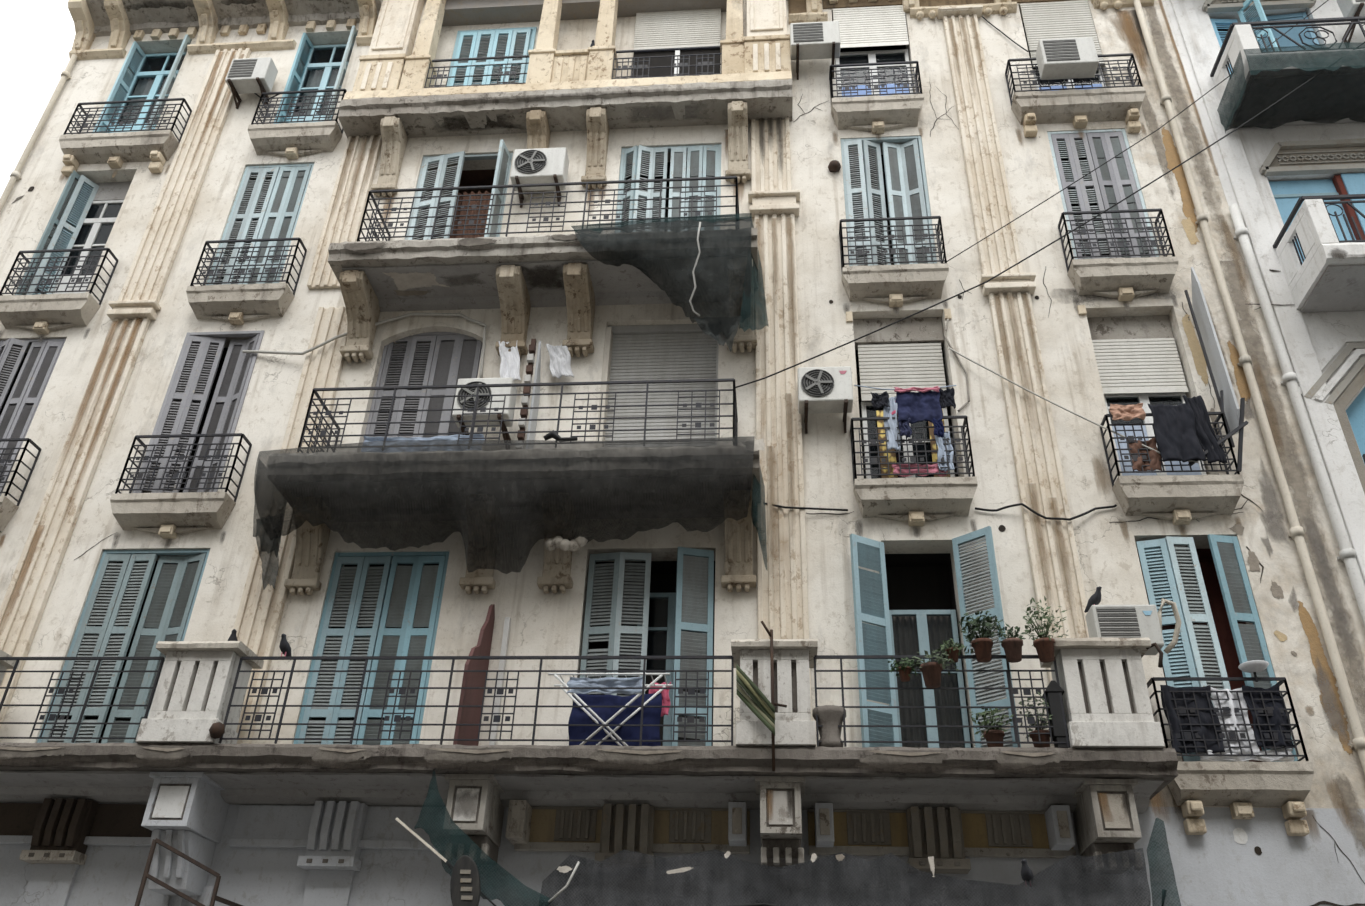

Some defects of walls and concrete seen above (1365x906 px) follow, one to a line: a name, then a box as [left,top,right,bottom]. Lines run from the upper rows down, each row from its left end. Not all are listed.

flaking render [1161,124,1200,245]
damp [1115,6,1365,714]
spalling [544,536,588,552]
flaking render [1229,475,1353,755]
crack [1312,815,1365,884]